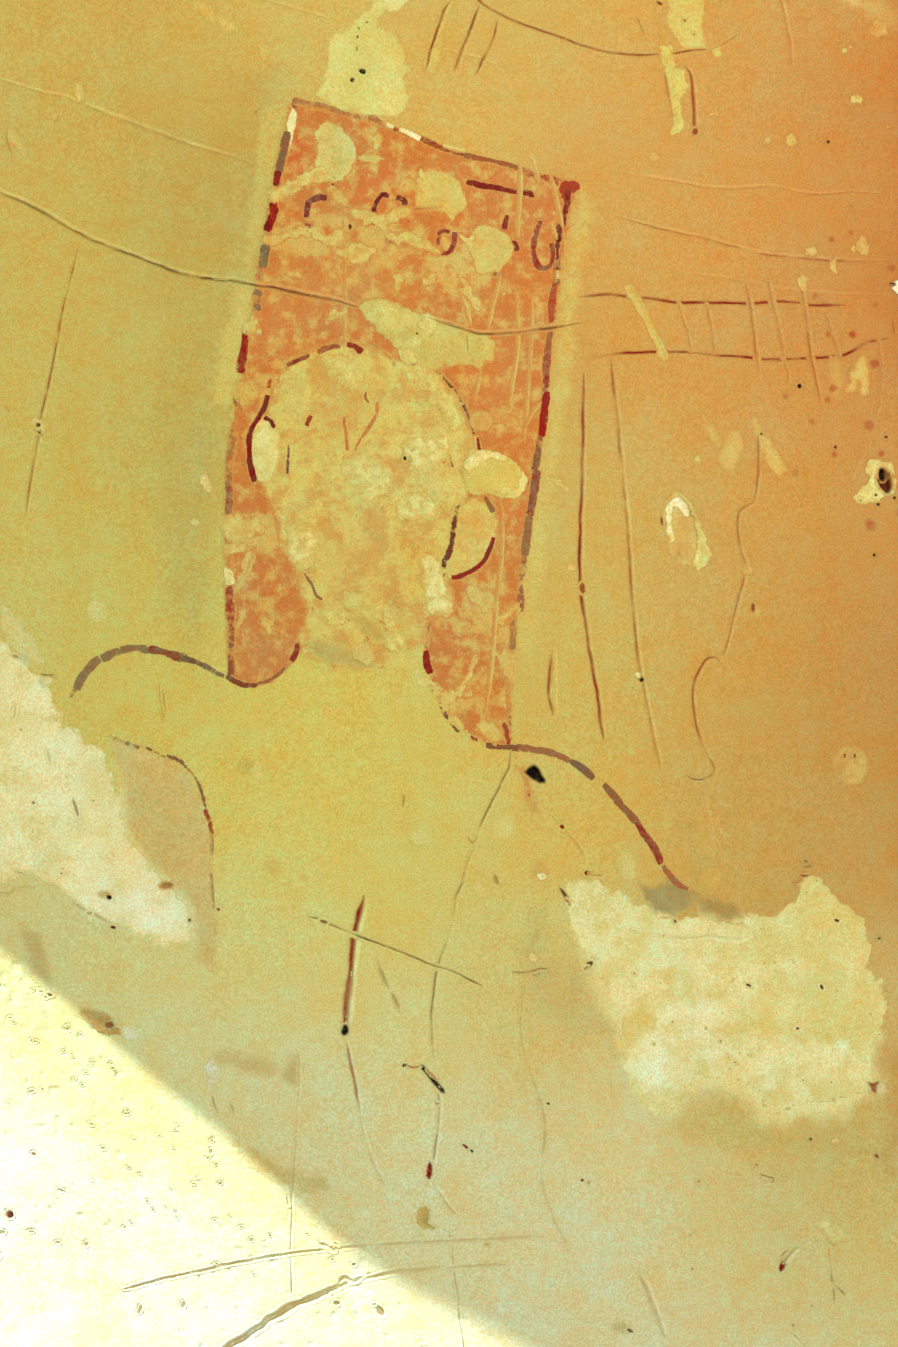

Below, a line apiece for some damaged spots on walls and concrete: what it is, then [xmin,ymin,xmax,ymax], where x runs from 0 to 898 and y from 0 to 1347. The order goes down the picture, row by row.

peeling [654,0,722,136]
peeling [261,0,515,312]
crack [0,187,360,309]
crack [419,313,581,353]
spalling [658,491,713,571]
peeling [850,458,898,507]
spalling [0,602,194,954]
spalling [528,858,890,1118]
spalling [61,1049,118,1087]
spalling [190,1138,224,1186]